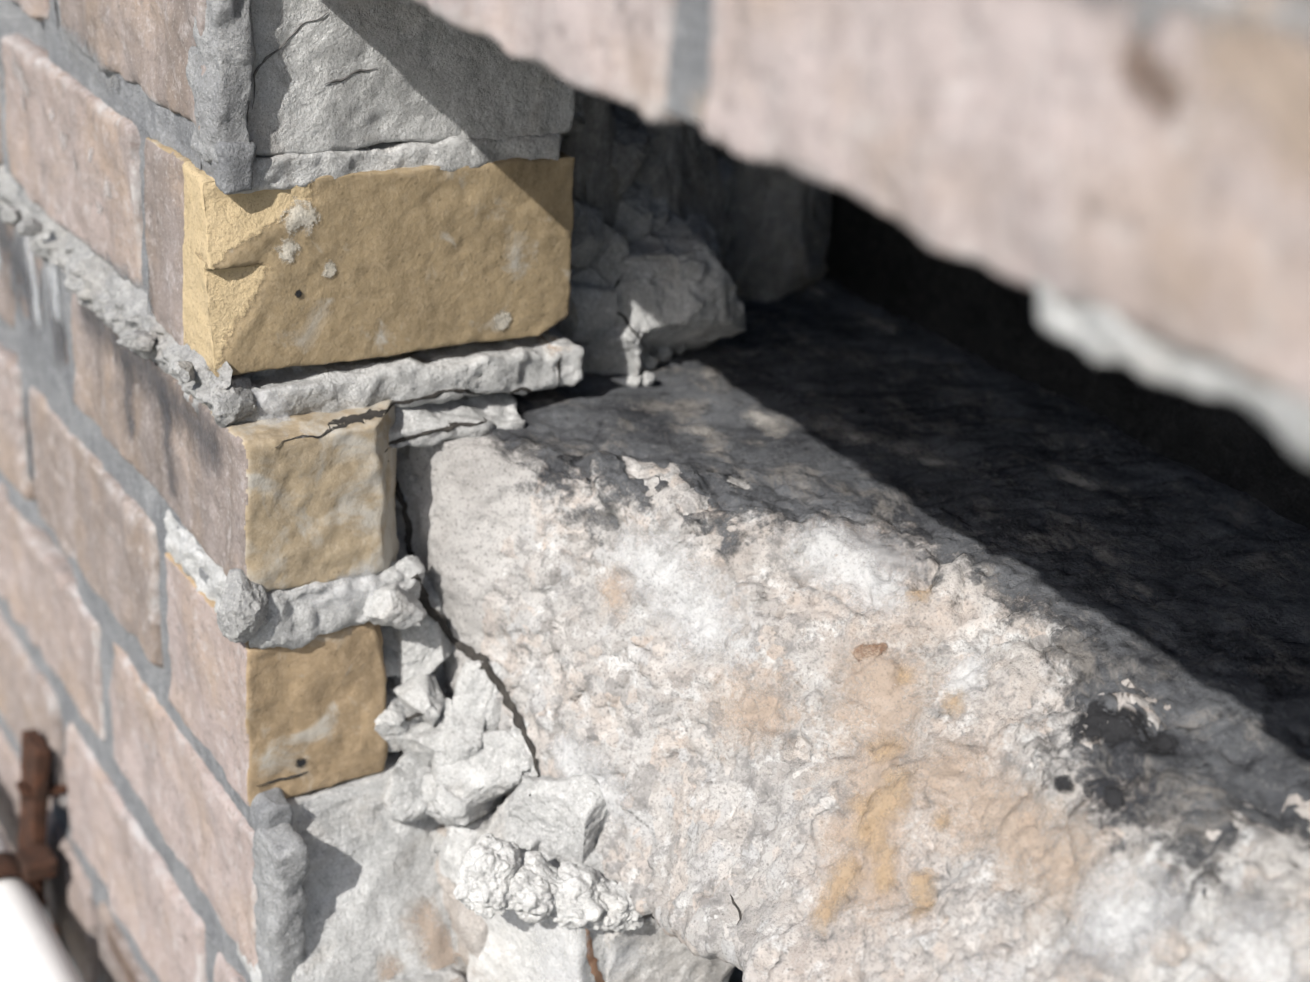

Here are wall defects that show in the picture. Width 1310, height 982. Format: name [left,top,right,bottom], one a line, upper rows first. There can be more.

crack [252,12,328,109]
crack [324,68,375,85]
crack [275,358,561,797]
spalling [432,456,1310,982]
water stain [486,276,1310,958]
water stain [1223,882,1296,982]